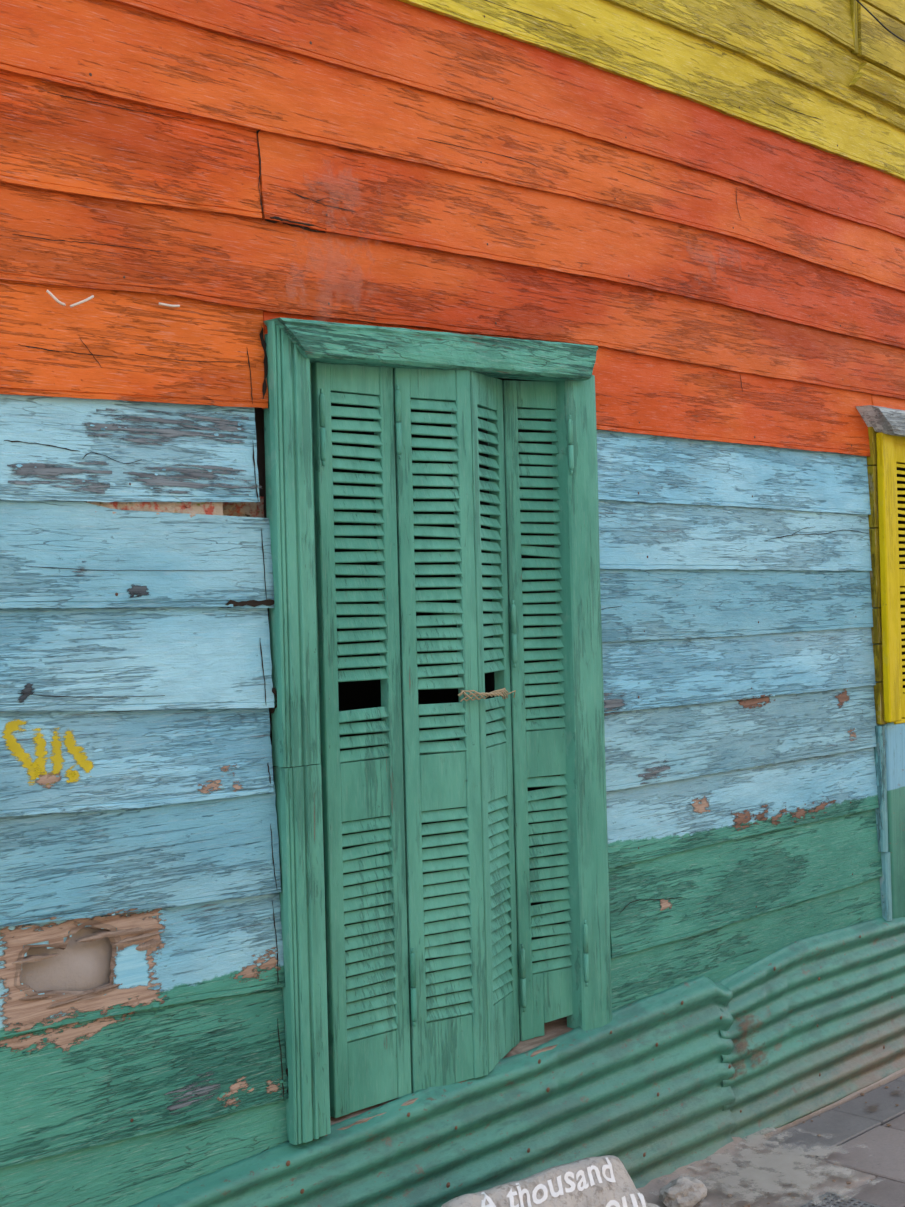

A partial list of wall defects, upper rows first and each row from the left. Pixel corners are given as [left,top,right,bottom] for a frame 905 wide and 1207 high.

peeling [82,408,249,445]
peeling [7,455,264,518]
peeling [198,763,245,794]
peeling [731,796,836,831]
peeling [0,908,169,1055]
peeling [230,947,281,983]
peeling [164,1071,284,1112]